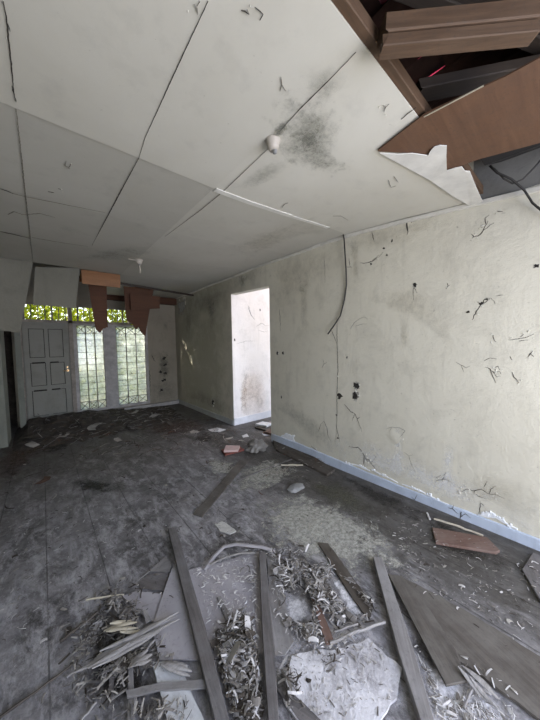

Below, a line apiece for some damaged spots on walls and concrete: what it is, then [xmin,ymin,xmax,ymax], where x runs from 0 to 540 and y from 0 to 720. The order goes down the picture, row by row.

crack [349,222,412,267]
crack [466,295,500,320]
crack [486,330,534,385]
crack [311,330,377,470]
crack [436,474,502,518]